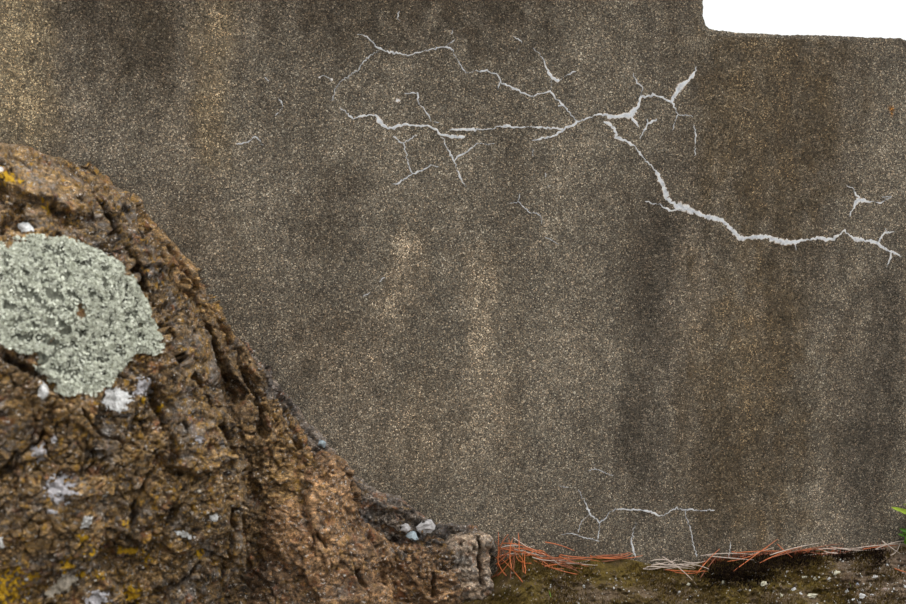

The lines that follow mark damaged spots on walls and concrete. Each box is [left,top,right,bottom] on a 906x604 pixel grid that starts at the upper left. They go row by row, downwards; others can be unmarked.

crack [318,33,901,266]
crack [561,469,715,558]